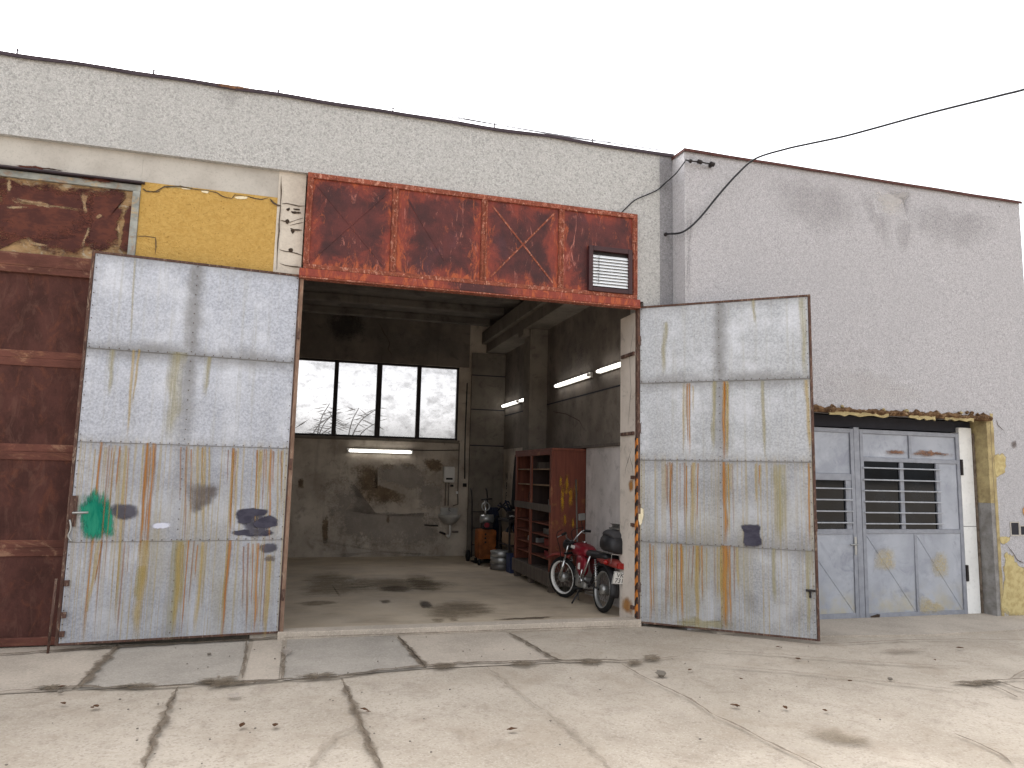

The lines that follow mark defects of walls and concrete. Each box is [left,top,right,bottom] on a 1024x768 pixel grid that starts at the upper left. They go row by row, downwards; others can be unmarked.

peeling [12,195,102,218]
crack [142,184,303,267]
corrosion [85,442,129,617]
corrosion [137,443,156,619]
corrosion [227,448,238,526]
corrosion [222,540,271,630]
corrosion [649,545,703,613]
corrosion [666,462,698,521]
corrosion [717,462,735,619]
spalling [814,404,1024,616]
crack [1,626,822,768]
crack [955,670,1024,697]